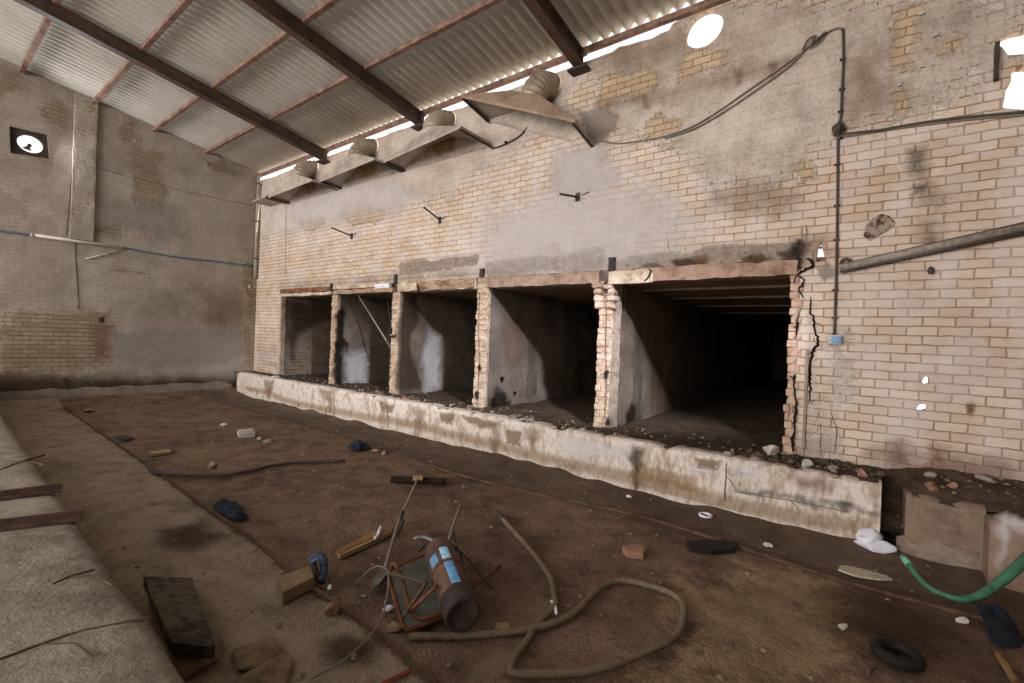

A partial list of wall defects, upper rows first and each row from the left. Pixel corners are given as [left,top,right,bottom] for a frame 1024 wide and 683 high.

spalling [596,63,658,110]
spalling [0,310,113,374]
crack [751,225,837,454]
leakage [0,377,207,392]
leakage [489,387,511,408]